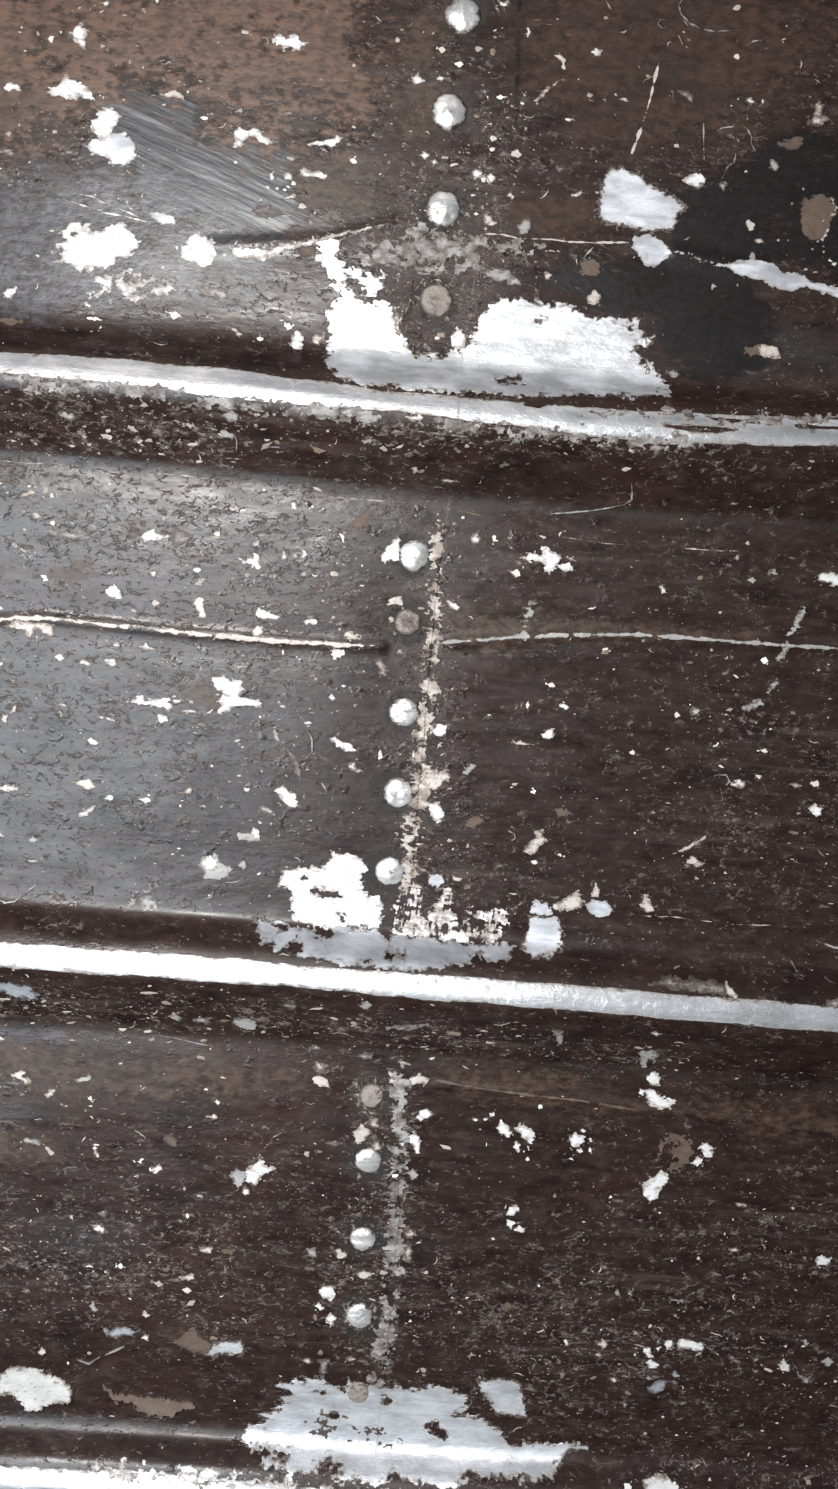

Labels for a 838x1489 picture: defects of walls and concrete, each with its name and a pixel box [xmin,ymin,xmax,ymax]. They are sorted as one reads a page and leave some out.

peeling [150,212,176,226]
peeling [3,286,18,299]
peeling [54,222,182,320]
peeling [180,231,229,300]
peeling [288,210,838,453]
peeling [0,373,382,444]
peeling [255,850,612,977]
peeling [171,1327,247,1361]
peeling [88,1356,589,1489]
peeling [624,1473,687,1489]